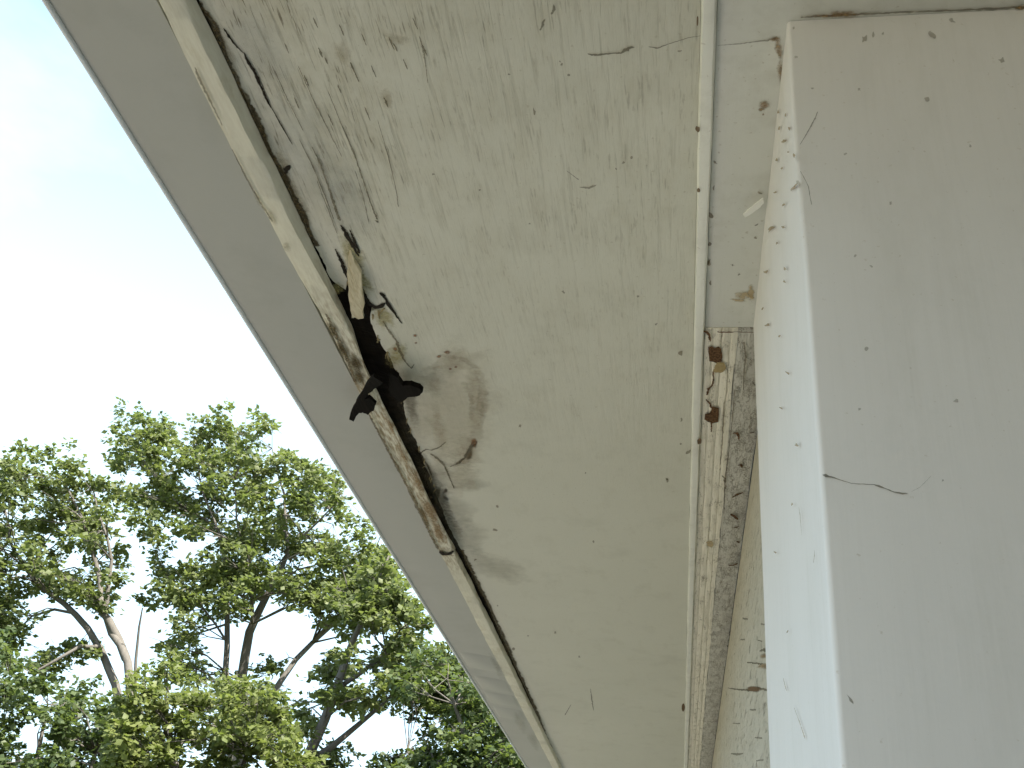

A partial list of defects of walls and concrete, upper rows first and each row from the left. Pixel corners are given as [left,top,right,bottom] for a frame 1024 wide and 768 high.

crack [420,441,475,488]
crack [823,474,931,494]
crack [461,550,551,745]